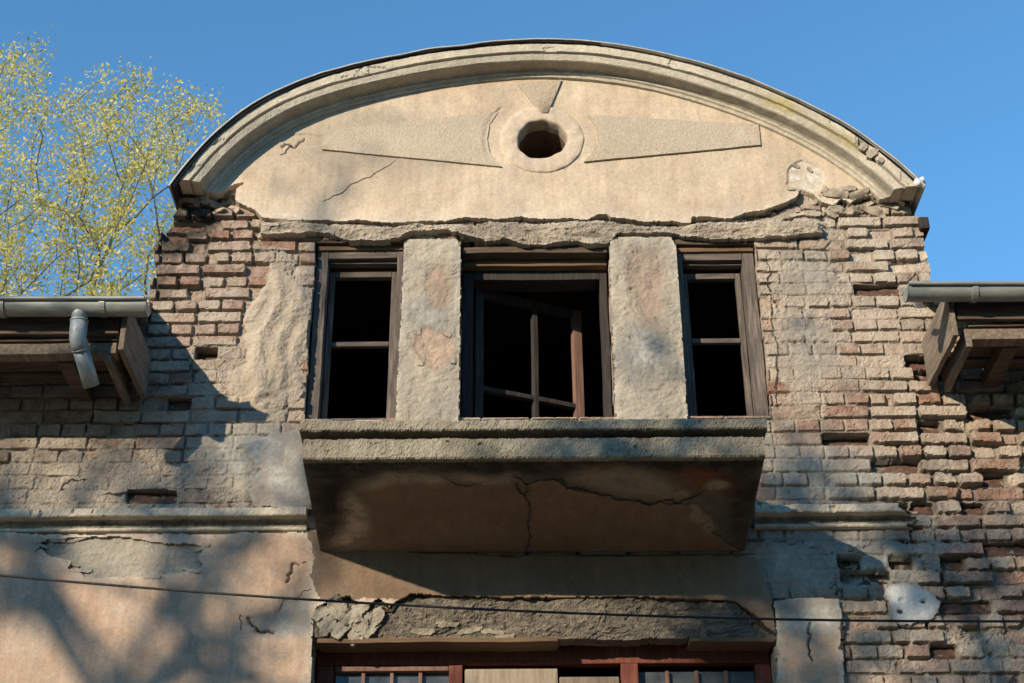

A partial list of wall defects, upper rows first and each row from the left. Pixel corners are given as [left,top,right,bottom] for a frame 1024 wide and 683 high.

crack [317,160,401,227]
spalling [771,162,899,221]
crack [463,219,553,227]
crack [590,197,876,227]
spalling [853,288,899,296]
spalling [966,412,1012,421]
spalling [871,464,918,474]
crack [555,478,703,506]
peeling [30,537,210,579]
crack [239,561,310,634]
spalling [311,593,396,648]
peeling [410,620,514,638]